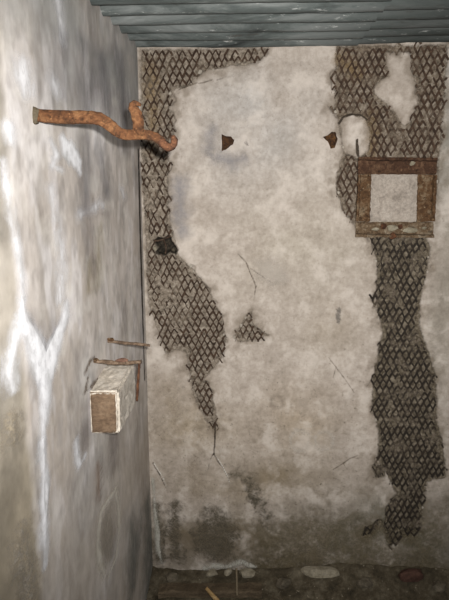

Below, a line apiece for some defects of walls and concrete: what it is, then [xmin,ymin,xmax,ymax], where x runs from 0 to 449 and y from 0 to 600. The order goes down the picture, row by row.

flaking render [140,47,269,142]
flaking render [330,42,449,228]
flaking render [140,140,269,430]
rust [93,358,142,402]
rust [107,338,150,347]
flaking render [362,237,448,550]
water stain [147,499,186,594]
water stain [192,508,441,570]